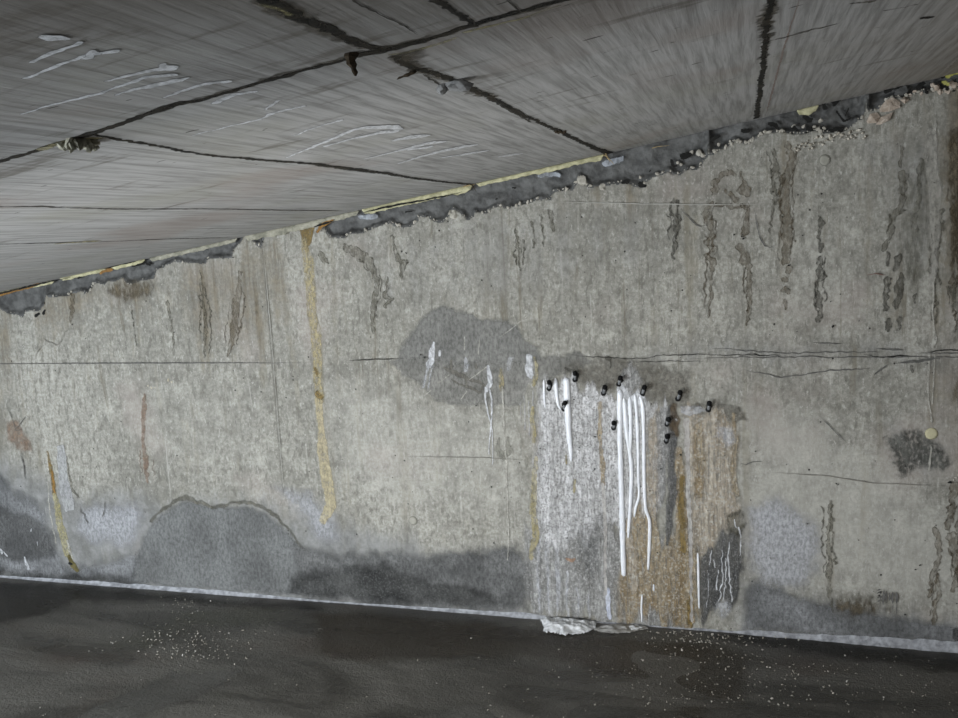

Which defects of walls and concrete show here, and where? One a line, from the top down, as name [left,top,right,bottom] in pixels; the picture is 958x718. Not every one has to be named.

spalling [0,237,264,318]
damp [286,119,489,164]
spalling [325,73,958,238]
damp [667,200,682,259]
damp [703,169,751,318]
damp [813,217,827,322]
damp [882,130,958,332]
crack [575,342,958,378]
damp [0,445,539,621]
corrosion [597,401,606,484]
corrosion [618,403,740,629]
damp [564,356,958,669]